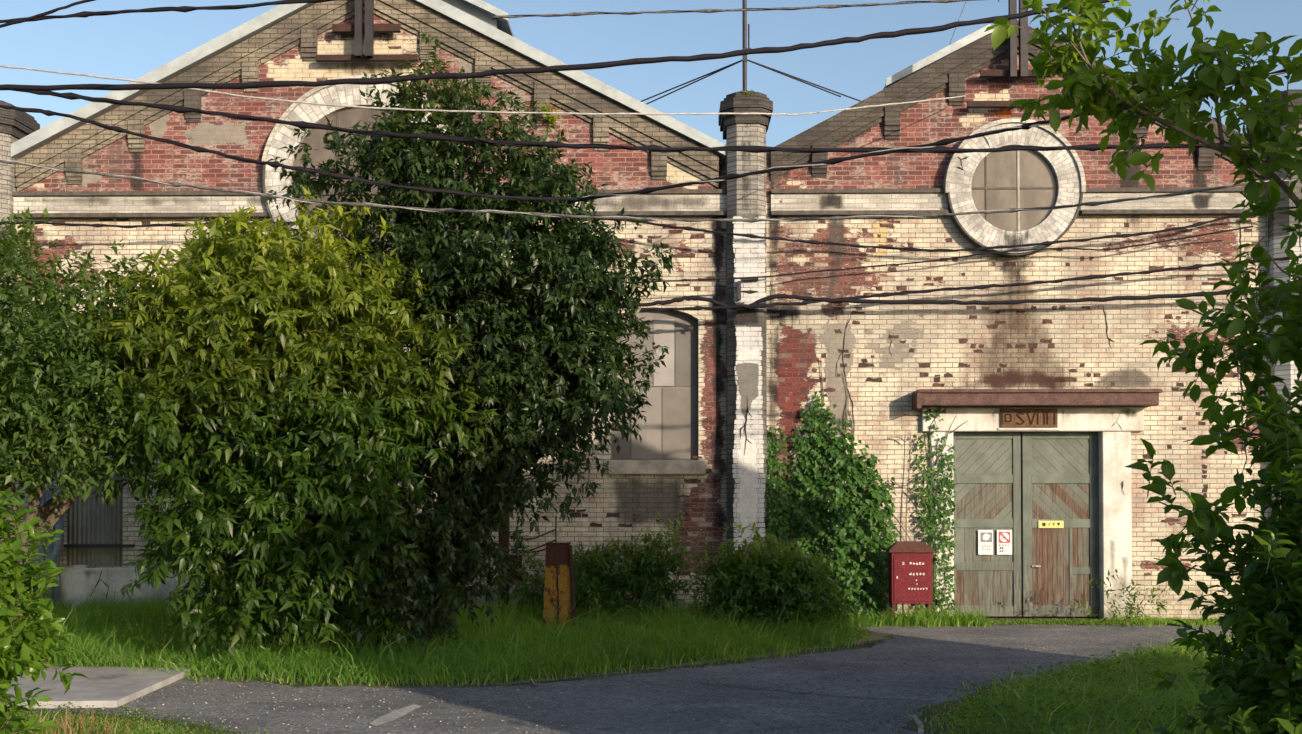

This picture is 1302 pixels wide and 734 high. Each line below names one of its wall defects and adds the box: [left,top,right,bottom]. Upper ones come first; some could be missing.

peeling [608,216,965,333]
leakage [975,349,1064,389]
leakage [1095,370,1149,388]
peeling [656,316,882,578]
spalling [568,509,632,527]
leakage [619,481,682,527]